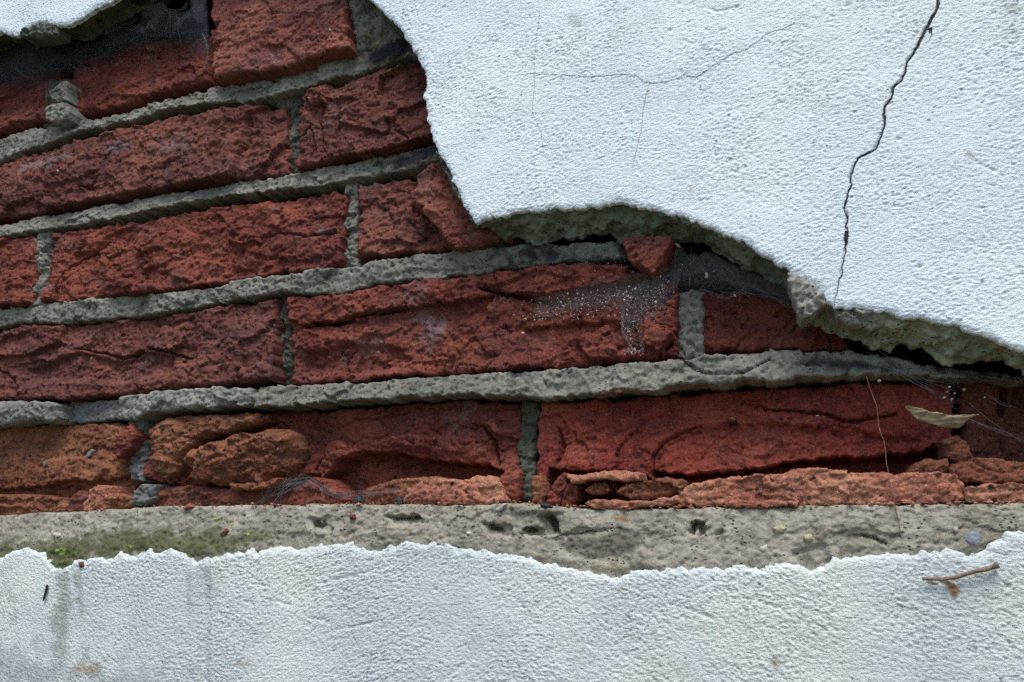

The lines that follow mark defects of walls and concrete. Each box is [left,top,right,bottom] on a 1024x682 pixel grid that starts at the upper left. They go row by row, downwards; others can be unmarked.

flaking render [0,0,156,51]
flaking render [367,0,426,73]
flaking render [424,87,1024,376]
crack [834,0,940,303]
flaking render [0,412,1024,578]